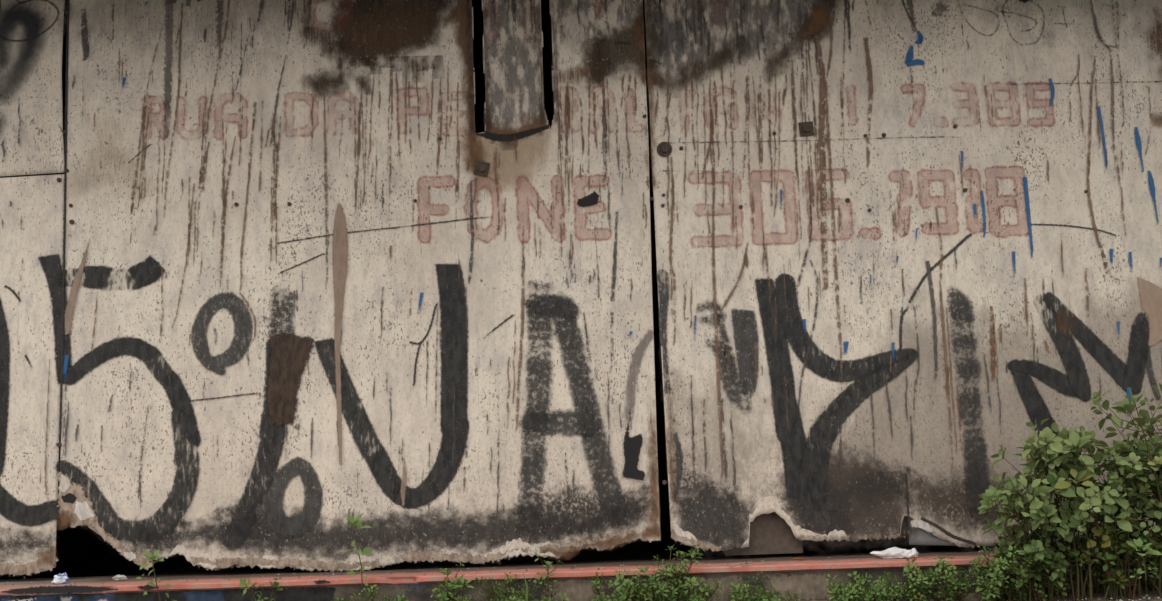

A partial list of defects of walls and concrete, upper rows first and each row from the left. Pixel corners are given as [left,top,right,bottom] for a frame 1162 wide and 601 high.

water stain [373,374,407,506]
water stain [487,414,505,515]
spalling [56,472,154,570]
peeling [0,547,380,601]
spalling [401,523,722,564]
spalling [799,519,933,541]